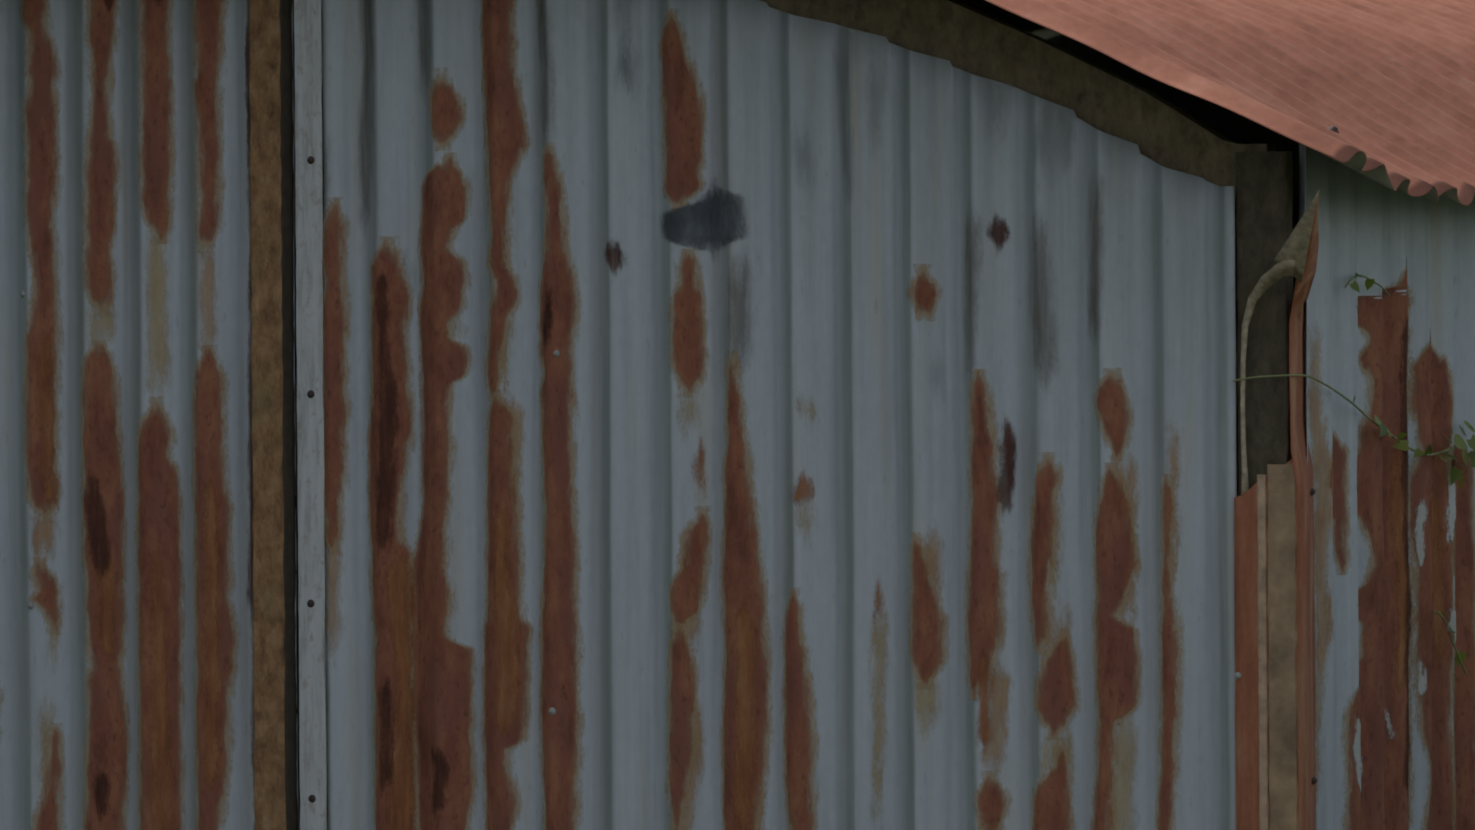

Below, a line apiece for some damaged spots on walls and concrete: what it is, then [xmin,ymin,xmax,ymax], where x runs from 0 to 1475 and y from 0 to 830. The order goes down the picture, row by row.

rust [21,0,62,648]
rust [81,0,238,830]
rust [322,197,350,633]
rust [367,0,583,830]
rust [660,12,706,209]
rust [670,248,707,416]
rust [666,350,818,830]
rust [909,532,948,713]
rust [966,369,1016,830]
rust [1028,370,1141,830]
rust [1156,437,1182,830]
rust [1328,260,1475,830]